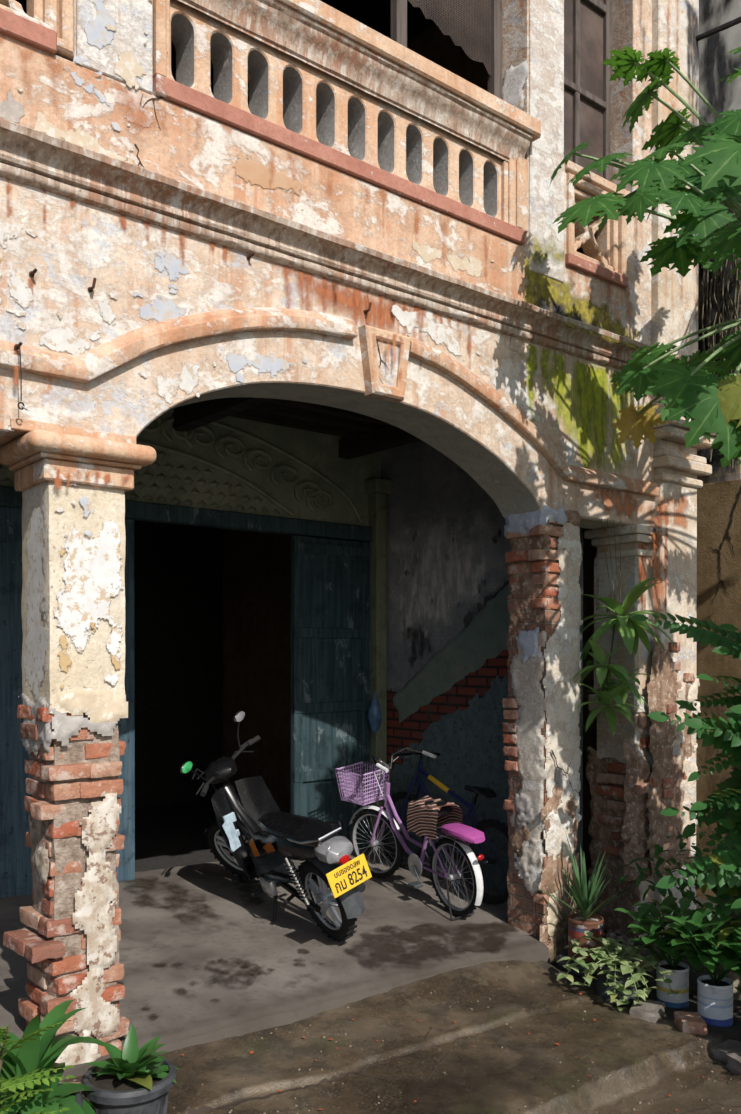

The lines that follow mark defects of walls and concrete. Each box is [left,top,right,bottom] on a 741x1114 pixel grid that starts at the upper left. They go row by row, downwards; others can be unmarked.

peeling [0,86,146,168]
peeling [63,0,153,131]
damp [686,0,741,143]
peeling [39,292,118,356]
peeling [139,352,307,404]
damp [526,346,622,468]
damp [697,254,741,380]
damp [699,447,739,475]
crack [709,488,741,603]
spalling [3,483,130,1066]
spalling [387,505,701,965]
damp [346,923,517,968]